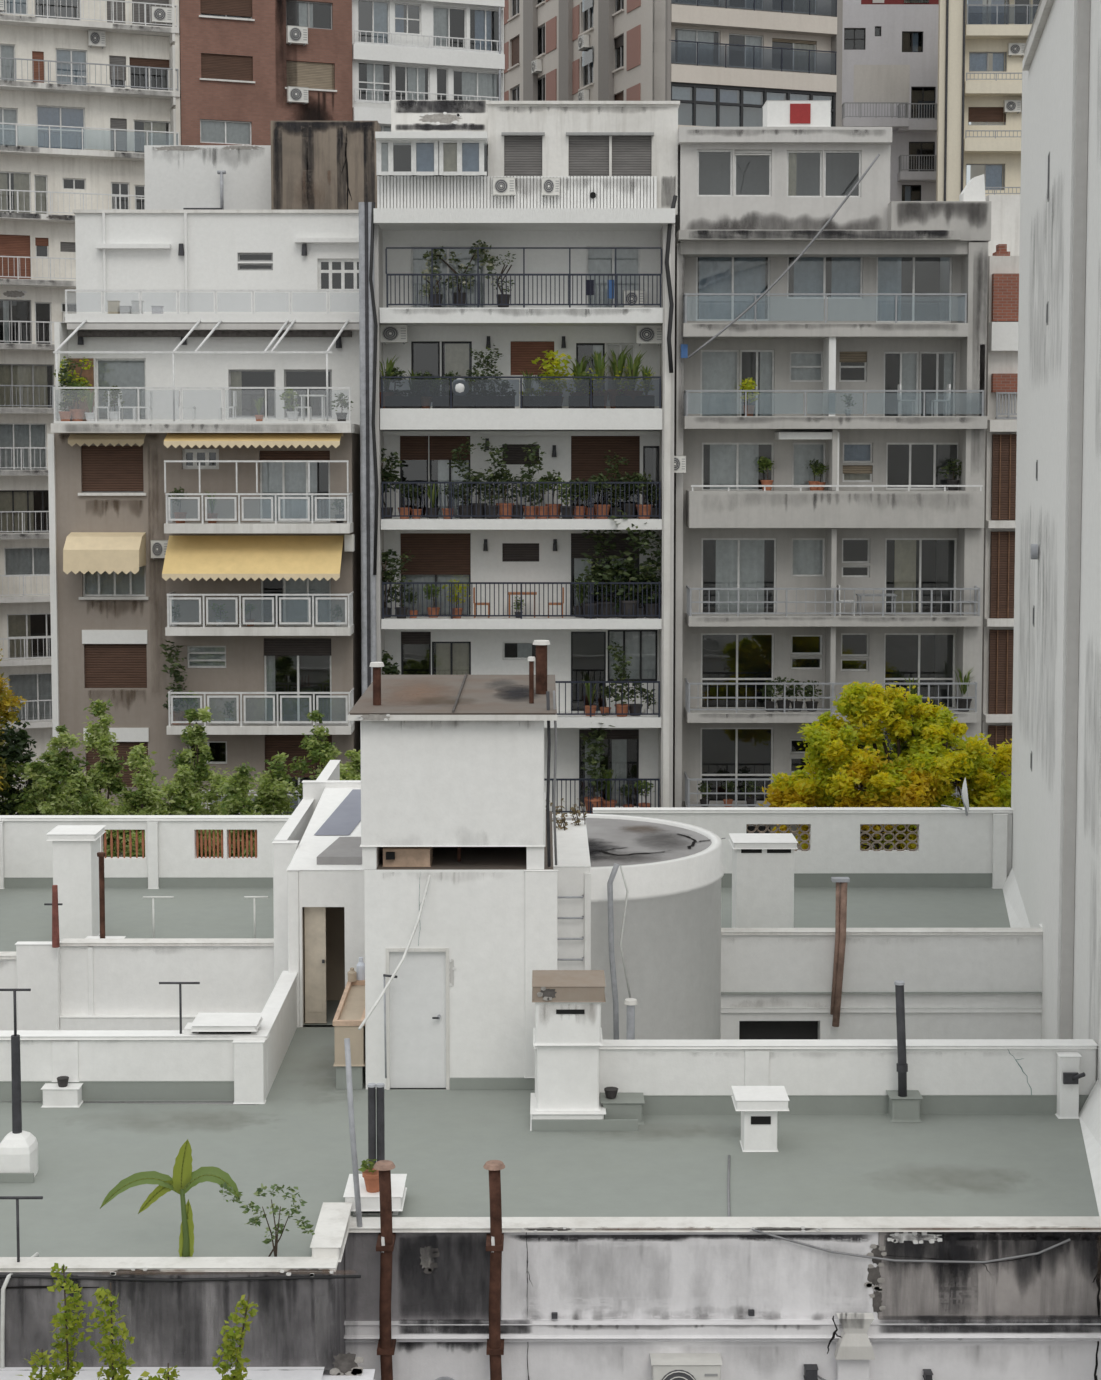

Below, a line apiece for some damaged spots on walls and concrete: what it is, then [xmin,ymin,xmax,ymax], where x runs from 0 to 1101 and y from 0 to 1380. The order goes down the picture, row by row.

damp [274,93,375,208]
damp [691,203,986,239]
damp [398,1236,529,1349]
damp [883,1232,1101,1333]